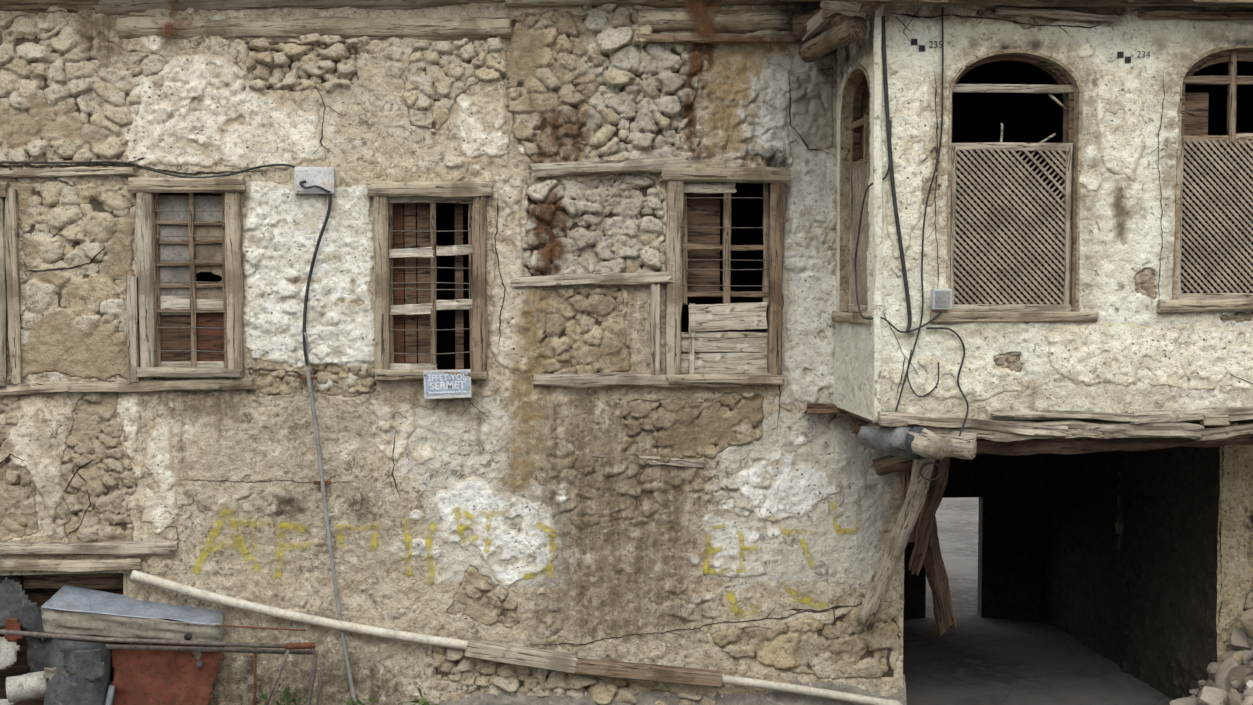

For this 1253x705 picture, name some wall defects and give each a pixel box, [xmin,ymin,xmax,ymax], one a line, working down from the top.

corrosion [684,0,722,159]
flaking render [0,11,439,542]
corrosion [529,193,567,276]
spalling [403,4,704,402]
damp [509,293,547,489]
crack [62,459,100,538]
flaking render [409,477,568,628]
crack [523,600,895,645]
spalling [711,604,902,679]